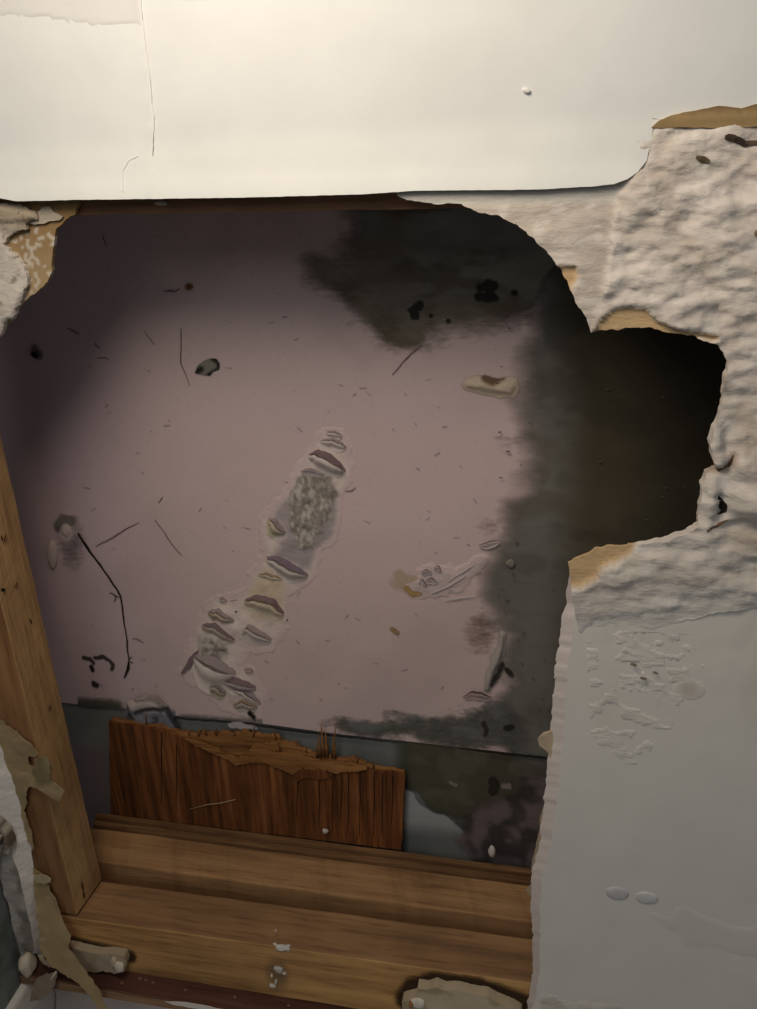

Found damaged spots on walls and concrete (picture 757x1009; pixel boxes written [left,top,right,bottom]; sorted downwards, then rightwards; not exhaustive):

spalling [0,202,64,337]
spalling [397,118,757,634]
crack [77,498,180,678]
peeling [463,630,513,702]
water stain [303,208,727,869]